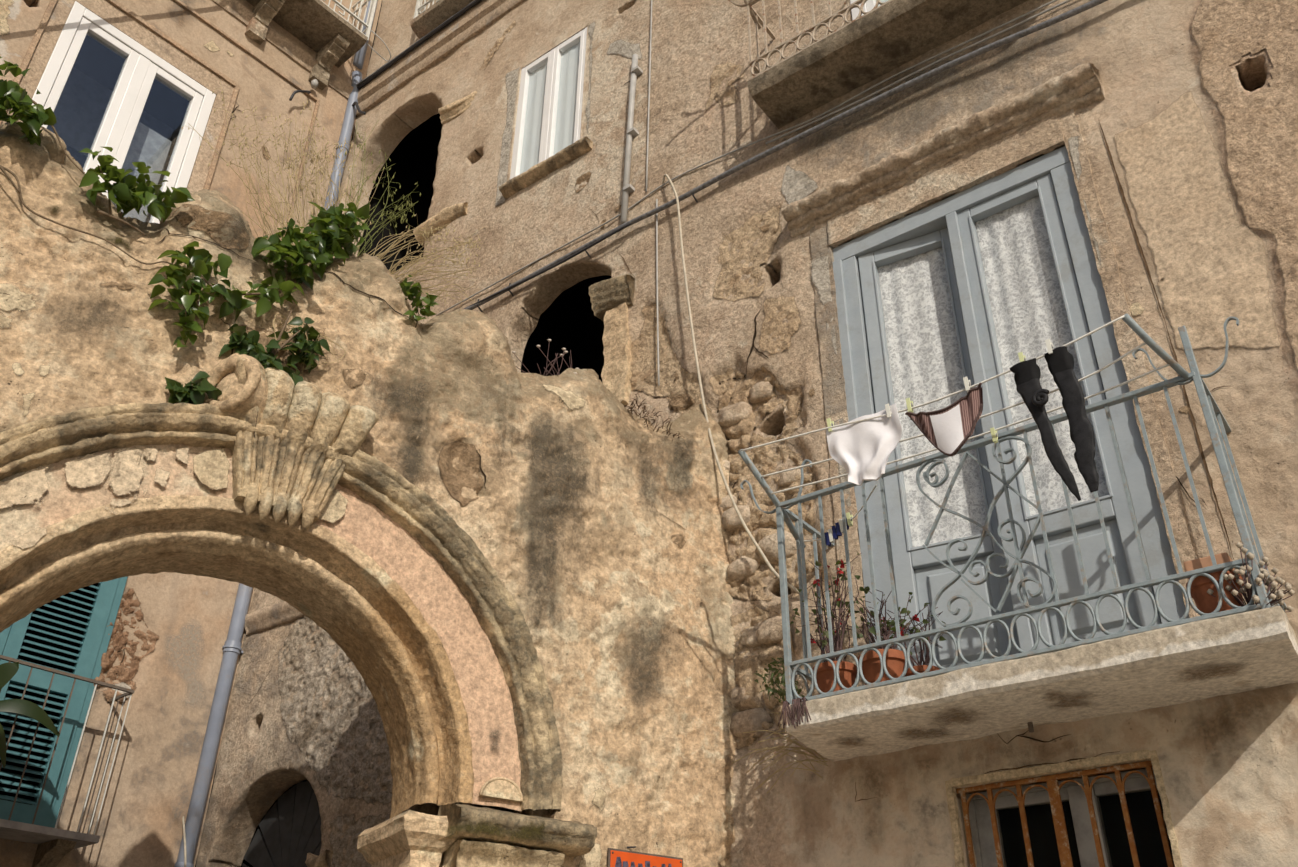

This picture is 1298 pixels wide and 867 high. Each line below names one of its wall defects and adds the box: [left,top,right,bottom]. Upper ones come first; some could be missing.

damp [639,440,694,499]
damp [524,418,585,605]
damp [630,630,663,699]
damp [1185,665,1241,681]
damp [902,709,976,738]
crack [984,730,1120,774]